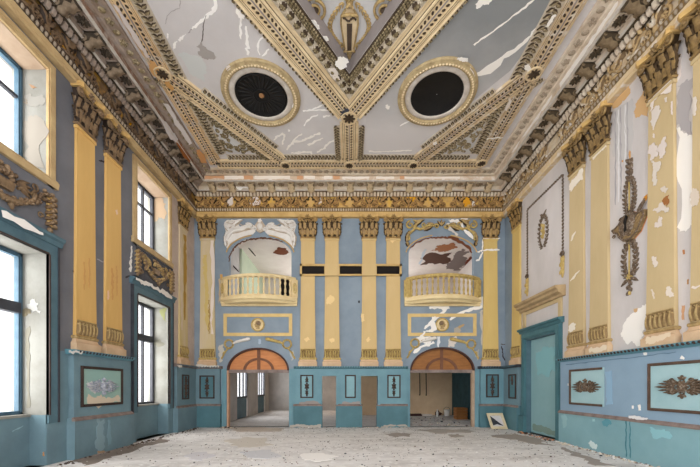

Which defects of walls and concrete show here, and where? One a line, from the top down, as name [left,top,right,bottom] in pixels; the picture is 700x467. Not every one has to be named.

peeling [22,94,49,169]
flaking render [593,54,700,232]
flaking render [228,237,289,261]
flaking render [410,223,472,271]
flaking render [621,304,671,355]